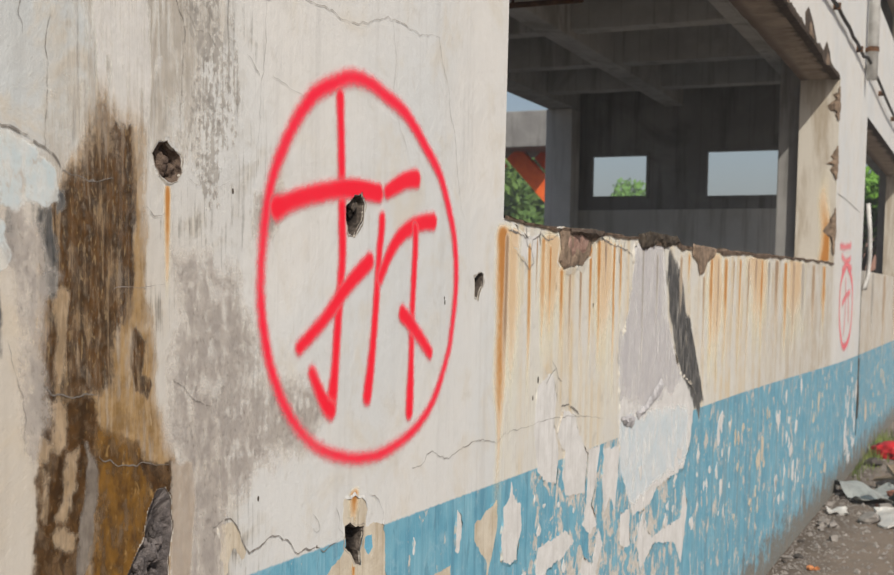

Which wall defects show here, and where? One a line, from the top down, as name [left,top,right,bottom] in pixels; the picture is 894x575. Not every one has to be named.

crack [309,0,449,87]
spalling [773,0,841,121]
water stain [3,0,324,575]
rust [495,225,622,439]
rust [703,254,802,337]
rust [811,196,830,320]
crack [414,404,604,468]
peeling [504,208,837,575]
spalling [843,361,888,464]
crack [213,510,342,554]
peeling [326,492,387,575]
peeling [454,479,574,575]